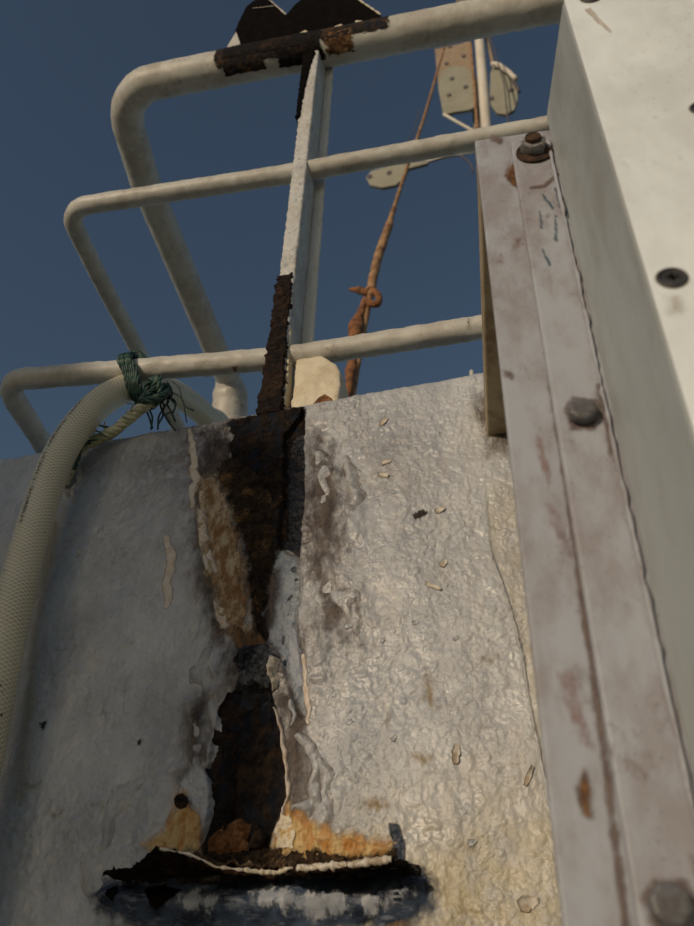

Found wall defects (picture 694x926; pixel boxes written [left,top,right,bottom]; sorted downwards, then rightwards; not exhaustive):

corrosion [213,16,390,77]
corrosion [196,272,333,649]
peeling [261,432,306,716]
peeling [142,762,215,852]
peeling [273,707,292,815]
corrosion [201,688,398,866]
peeling [144,884,181,910]
peeling [336,875,413,897]